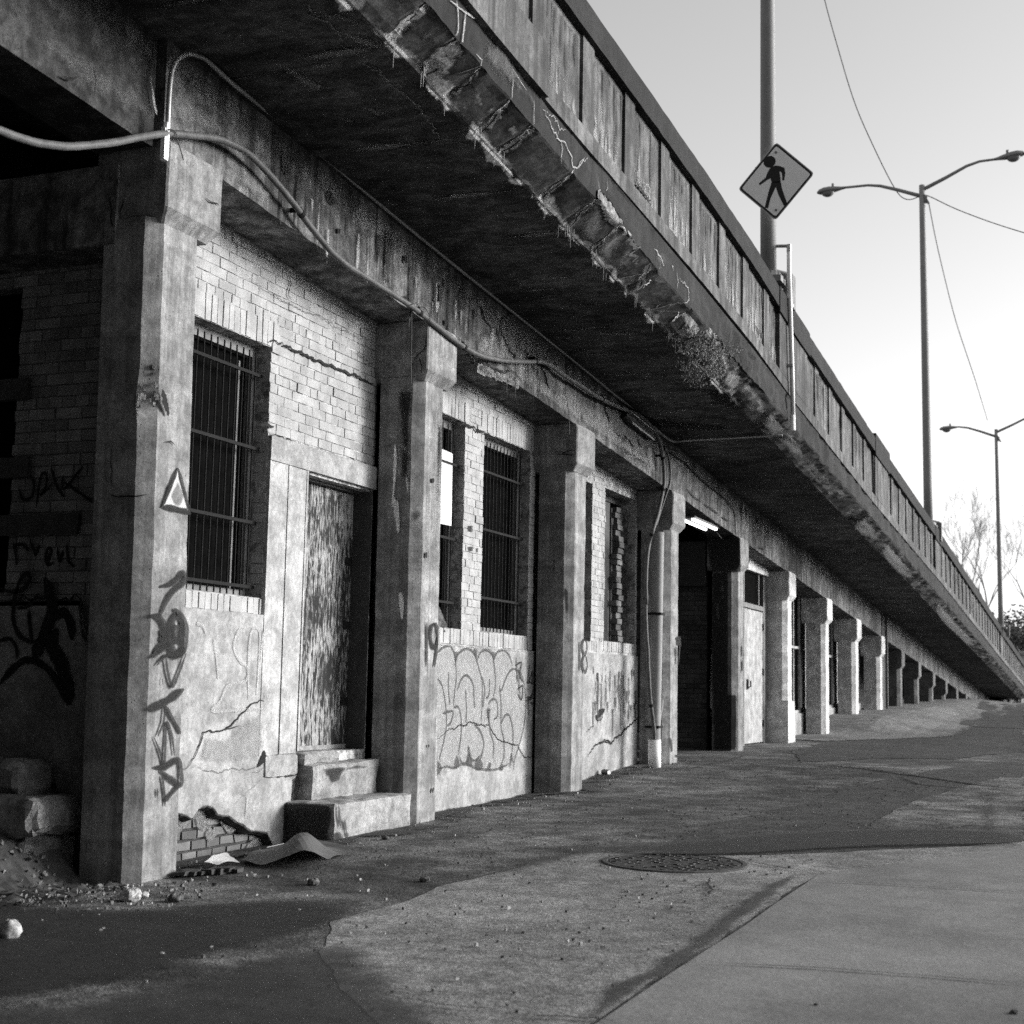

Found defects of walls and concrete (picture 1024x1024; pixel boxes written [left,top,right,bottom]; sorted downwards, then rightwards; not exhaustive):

crack [308,0,689,321]
peeling [593,189,628,227]
spalling [634,169,651,203]
crack [245,274,374,384]
spalling [682,328,730,379]
spalling [753,415,802,454]
crack [186,695,300,803]
crack [438,721,535,758]
crack [587,715,640,755]
flaking render [176,805,273,861]